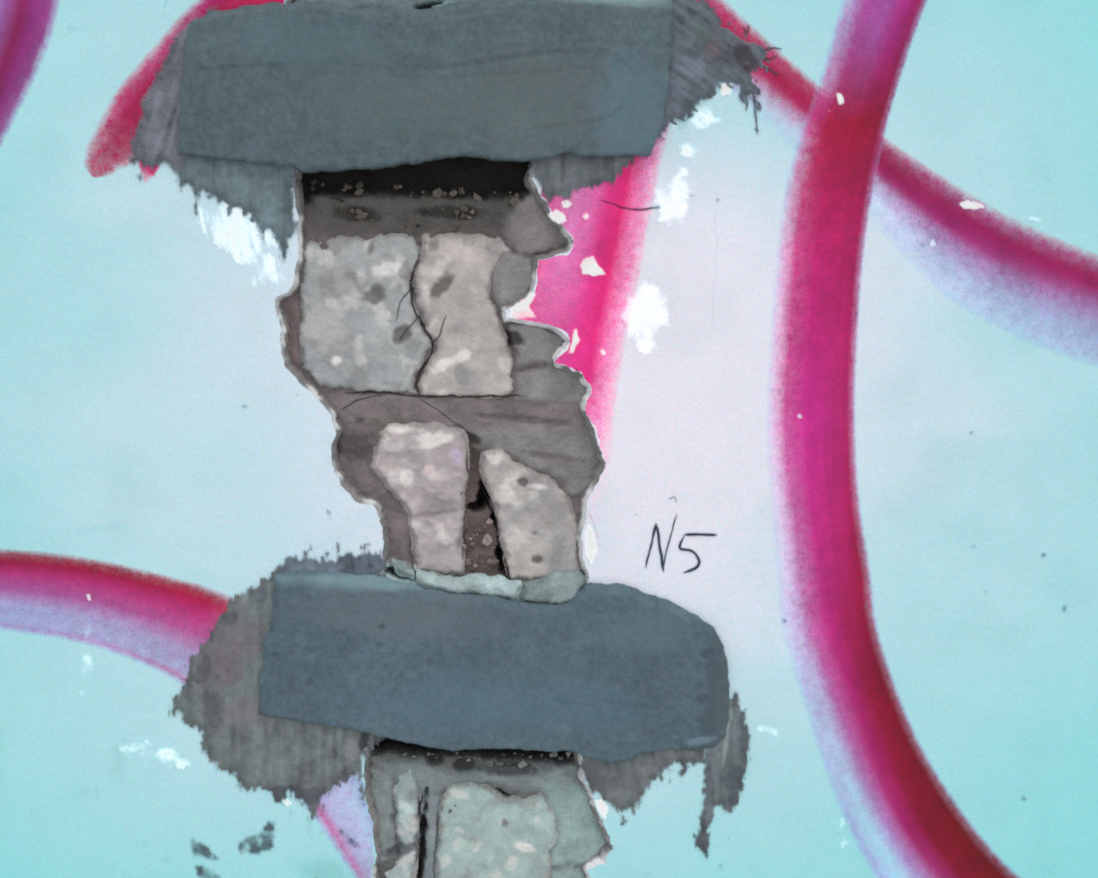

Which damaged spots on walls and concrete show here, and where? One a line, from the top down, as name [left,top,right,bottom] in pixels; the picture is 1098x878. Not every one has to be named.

flaking render [292,0,460,9]
peeling [581,257,604,276]
flaking render [282,157,599,601]
flaking render [370,737,608,878]